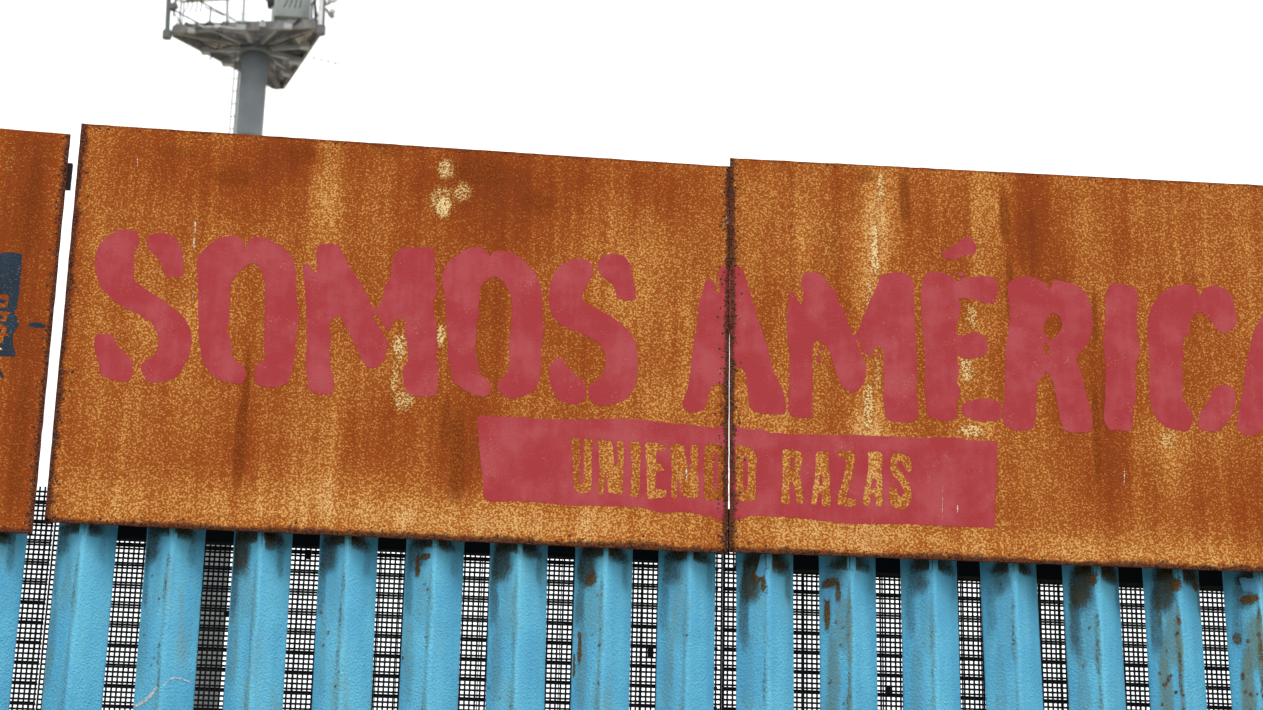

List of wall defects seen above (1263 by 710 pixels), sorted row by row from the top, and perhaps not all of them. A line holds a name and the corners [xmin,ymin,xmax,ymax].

corrosion [0,123,1263,652]
corrosion [573,602,601,677]
corrosion [1232,623,1263,661]